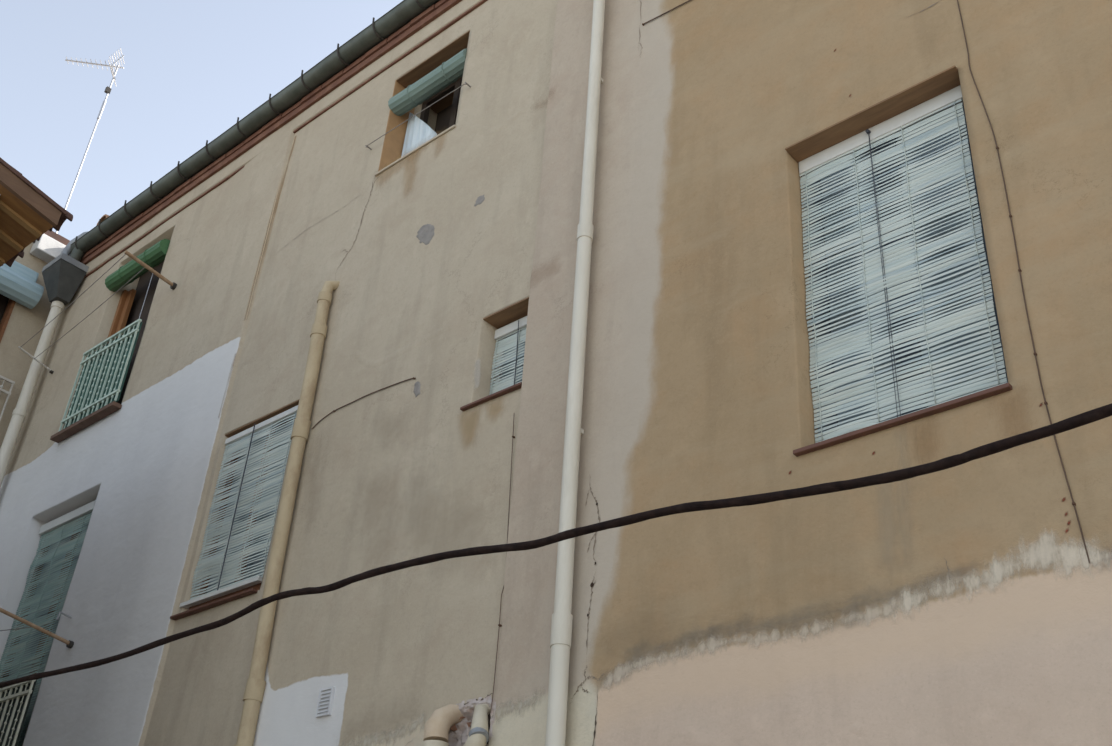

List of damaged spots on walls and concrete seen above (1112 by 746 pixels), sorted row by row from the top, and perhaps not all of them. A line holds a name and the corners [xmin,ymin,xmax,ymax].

crack [274,177,378,279]
spalling [416,224,435,245]
crack [571,481,604,743]